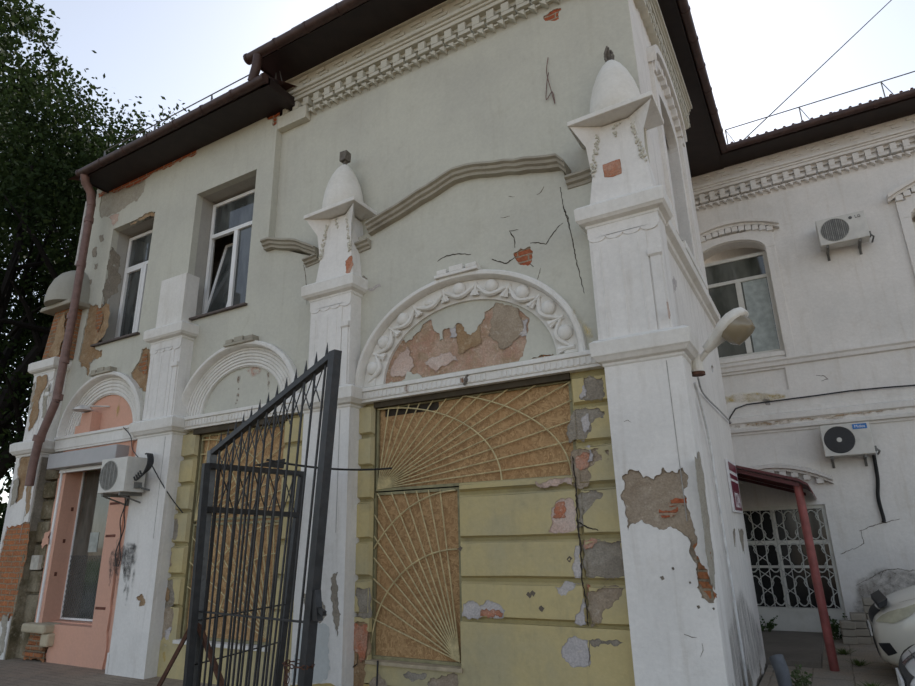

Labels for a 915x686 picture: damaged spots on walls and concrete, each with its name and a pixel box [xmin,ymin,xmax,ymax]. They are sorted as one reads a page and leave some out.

spalling [99,150,197,225]
crack [492,187,584,292]
spalling [79,234,122,376]
spalling [132,348,150,392]
spalling [386,303,552,384]
spalling [535,375,609,534]
spalling [0,456,32,655]
peeling [291,624,303,683]
peeling [312,572,341,683]
spalling [555,537,625,627]
peeling [561,636,623,668]
spalling [621,452,717,610]